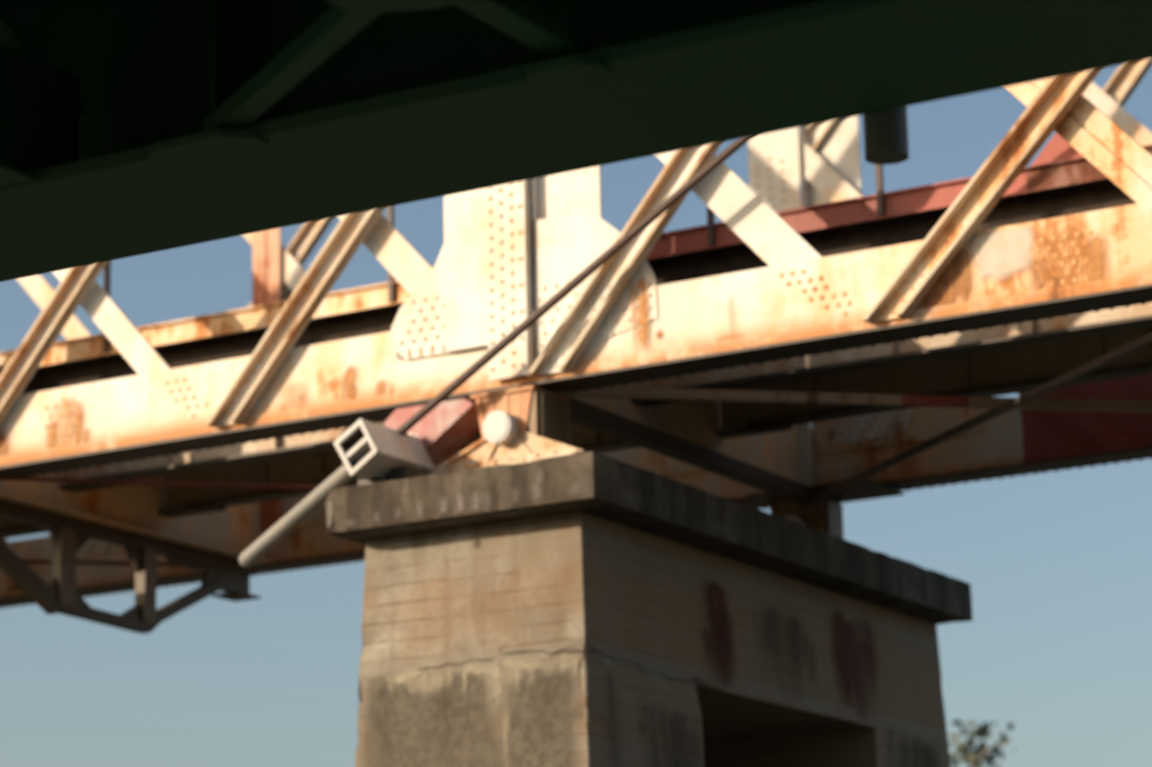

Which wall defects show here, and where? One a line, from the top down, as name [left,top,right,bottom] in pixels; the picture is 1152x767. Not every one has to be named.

rust [914,250,971,310]
rust [632,279,662,345]
rust [342,368,355,400]
rust [69,405,87,444]
crack [415,644,581,670]
rust [706,583,731,682]
damp [369,657,575,767]